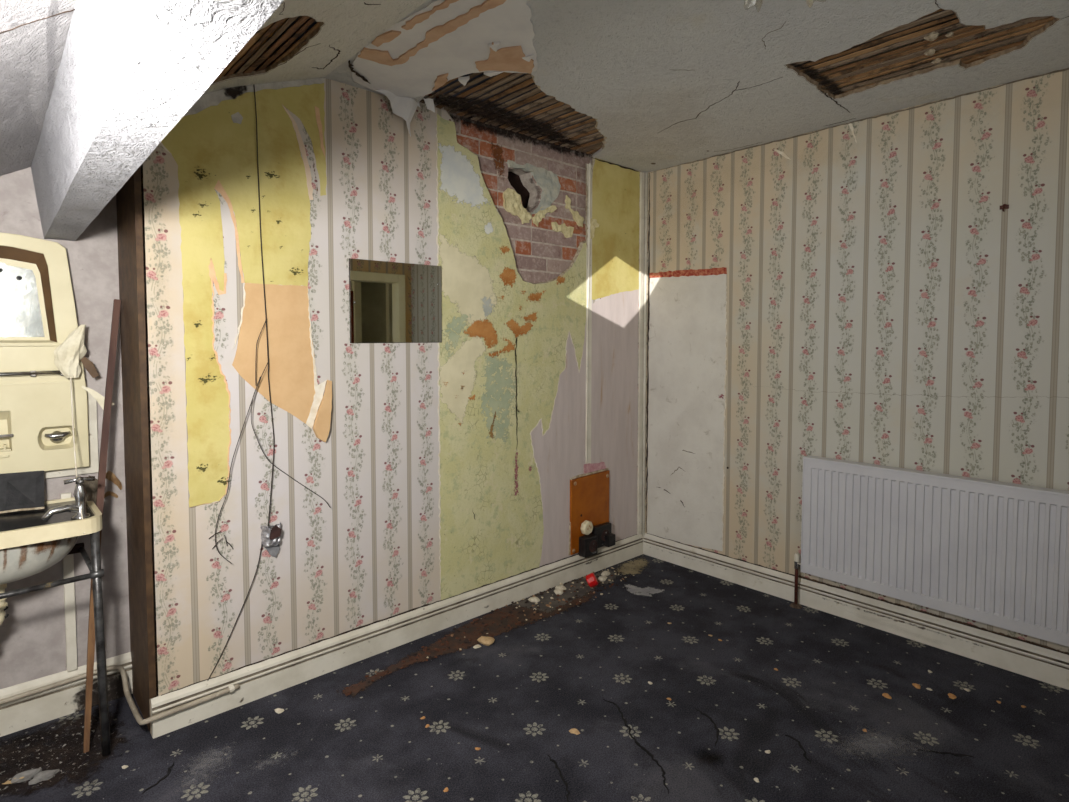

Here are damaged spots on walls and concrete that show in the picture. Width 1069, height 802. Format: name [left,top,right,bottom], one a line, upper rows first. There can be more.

crack [312,45,369,83]
flaking render [784,8,1061,100]
peeling [160,16,327,508]
crack [513,321,521,450]
peeling [420,72,640,600]
crack [591,68,1069,655]
rust [0,536,78,568]
crack [161,553,579,696]